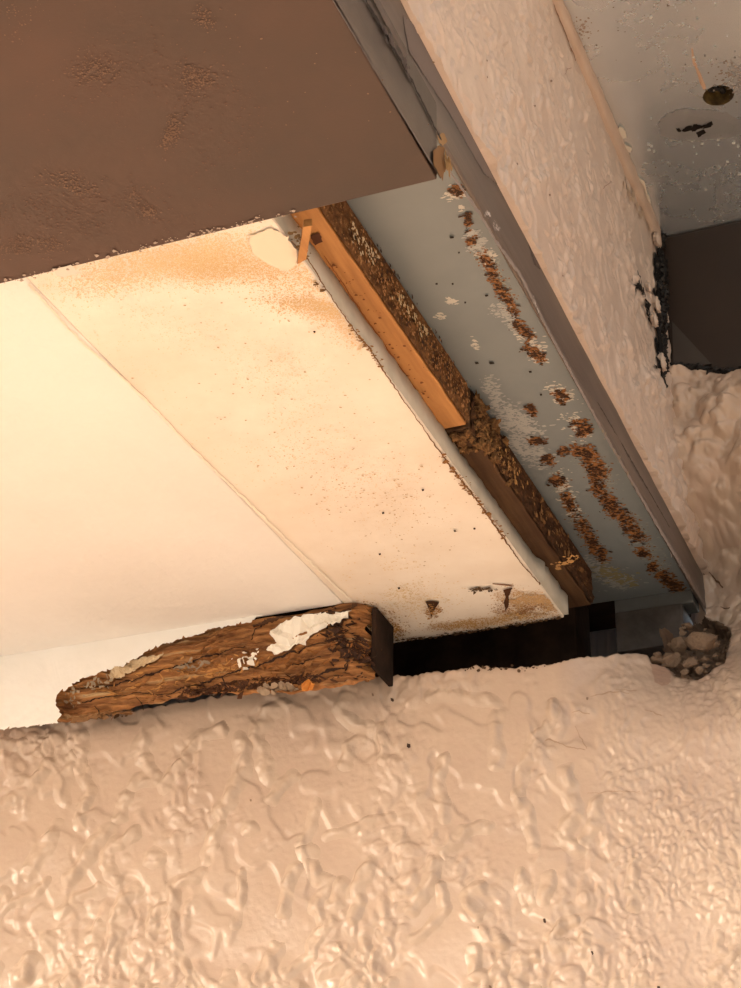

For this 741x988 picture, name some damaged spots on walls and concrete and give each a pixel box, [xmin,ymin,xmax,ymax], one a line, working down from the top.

leakage [657,109,741,141]
peeling [249,228,297,271]
rust [463,212,548,365]
leakage [38,223,559,640]
rust [525,418,686,593]
rust [424,601,443,620]
rust [469,583,512,611]
peeling [650,616,731,686]